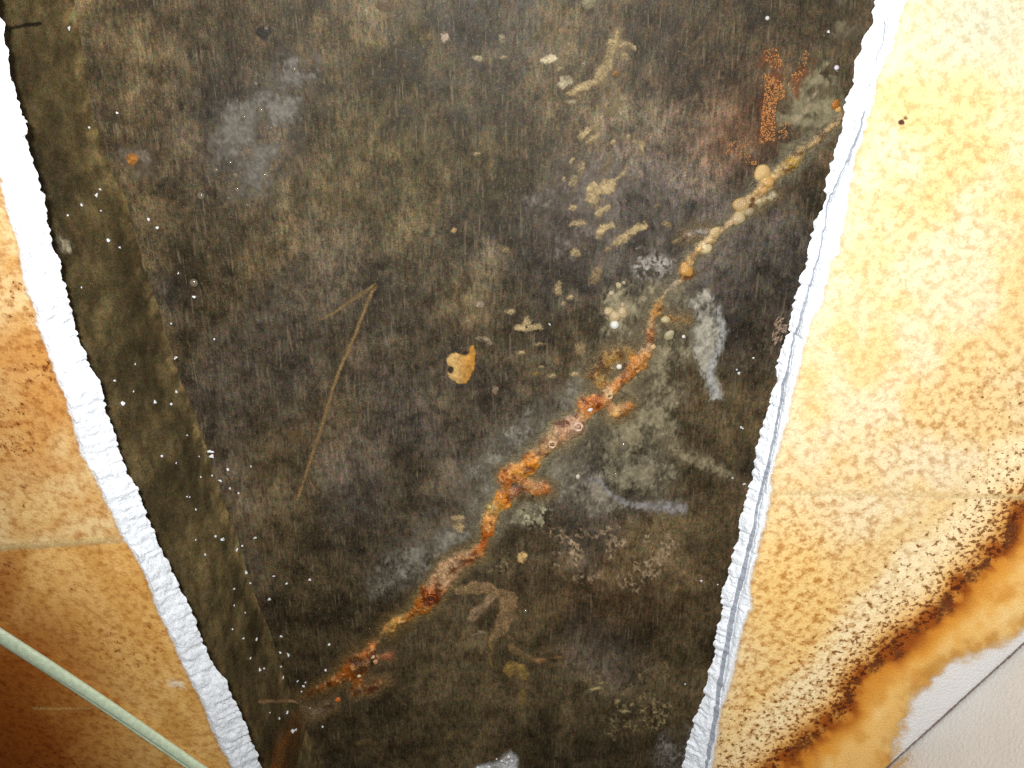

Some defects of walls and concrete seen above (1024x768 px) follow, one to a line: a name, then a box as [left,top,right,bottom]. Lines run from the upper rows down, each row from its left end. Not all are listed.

damp [208,52,320,198]
rust [726,48,809,165]
spalling [447,336,493,384]
peeling [504,309,559,378]
crack [258,99,845,724]
damp [504,152,733,581]
damp [713,0,1024,768]
damp [615,533,675,592]